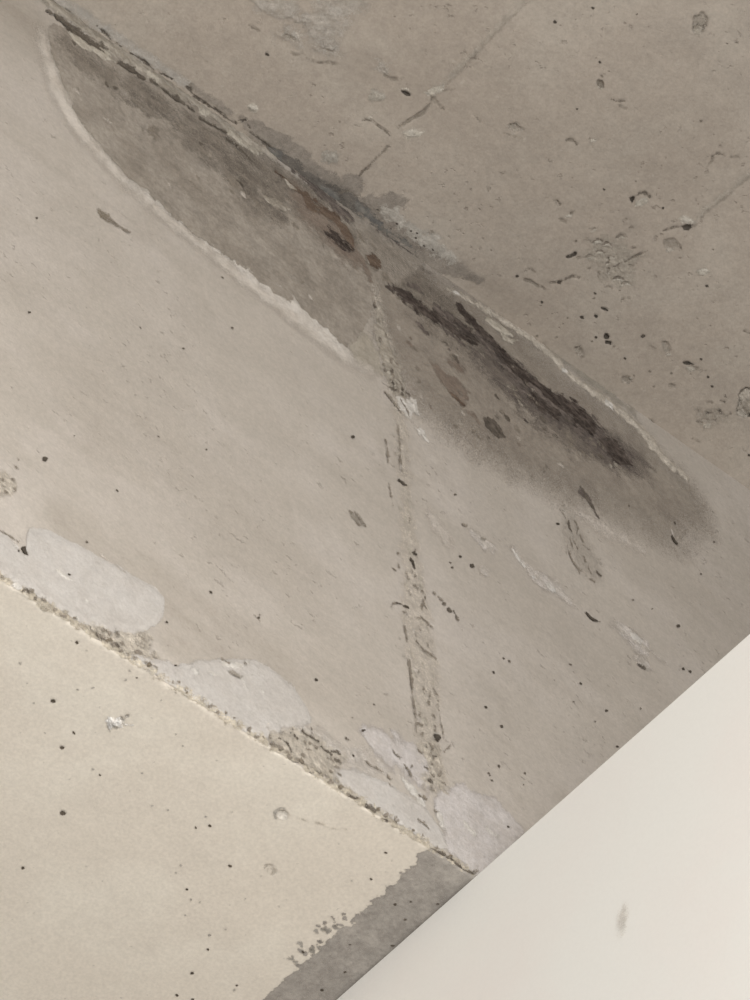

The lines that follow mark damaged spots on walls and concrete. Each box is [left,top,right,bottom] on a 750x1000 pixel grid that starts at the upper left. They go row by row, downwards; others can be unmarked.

leakage [31,20,723,566]
crack [369,283,451,776]
peeling [0,571,479,1000]